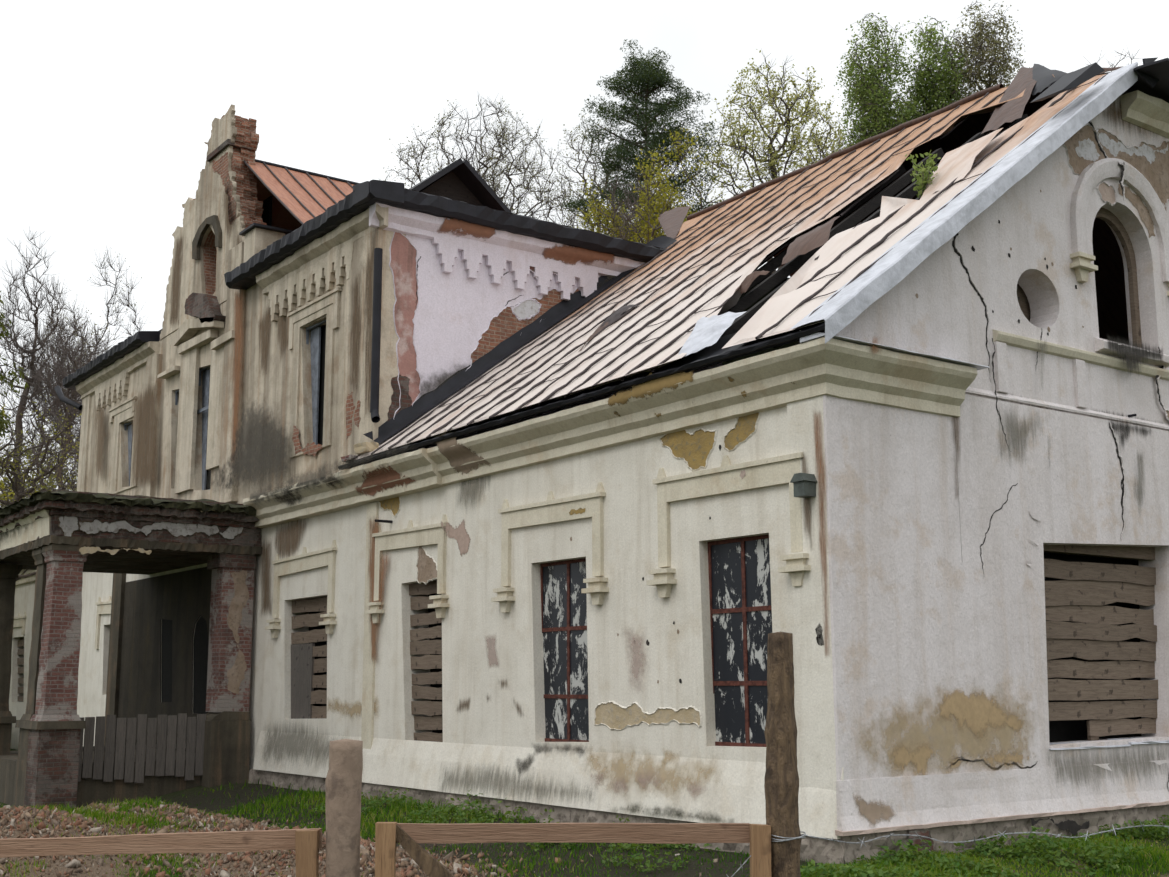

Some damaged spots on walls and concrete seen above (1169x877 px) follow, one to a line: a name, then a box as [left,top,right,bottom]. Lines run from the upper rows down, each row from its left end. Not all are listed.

spalling [1063,124,1169,213]
spalling [387,232,421,422]
flaking render [466,245,614,371]
crack [952,232,1011,452]
crack [1155,346,1166,412]
peeling [59,511,243,555]
water stain [211,407,407,502]
flaking render [356,465,415,518]
spalling [659,412,761,472]
crack [980,483,1018,573]
crack [1109,422,1126,541]
peeling [594,701,702,731]